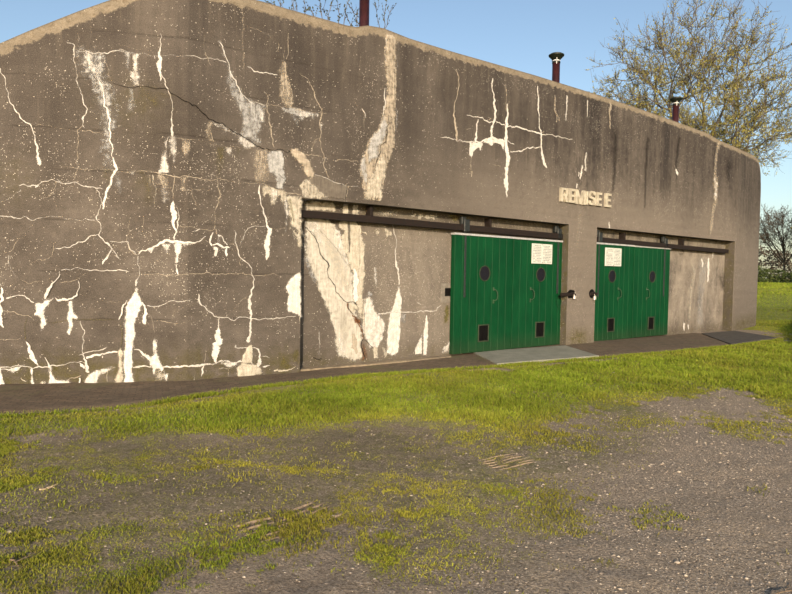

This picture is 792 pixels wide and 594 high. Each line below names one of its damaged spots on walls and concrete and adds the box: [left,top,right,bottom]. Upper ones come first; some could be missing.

efflorescence [85,54,115,161]
crack [453,71,570,168]
crack [0,33,356,342]
leakage [218,41,441,361]
crack [0,311,118,373]
crack [133,352,244,376]